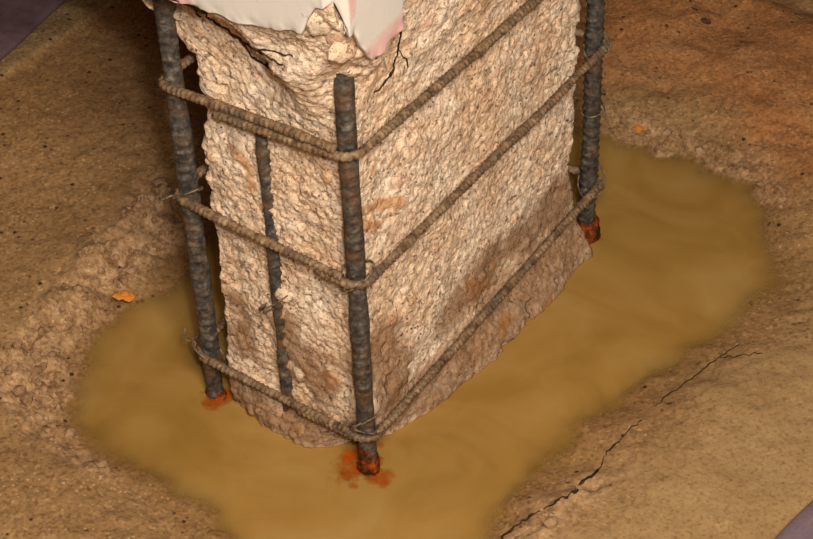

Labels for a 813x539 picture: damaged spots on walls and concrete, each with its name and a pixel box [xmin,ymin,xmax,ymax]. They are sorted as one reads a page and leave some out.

spalling [173,0,592,448]
rust [577,214,601,244]
rust [203,388,231,408]
crack [656,344,762,405]
rust [342,448,391,486]
crack [501,420,642,539]